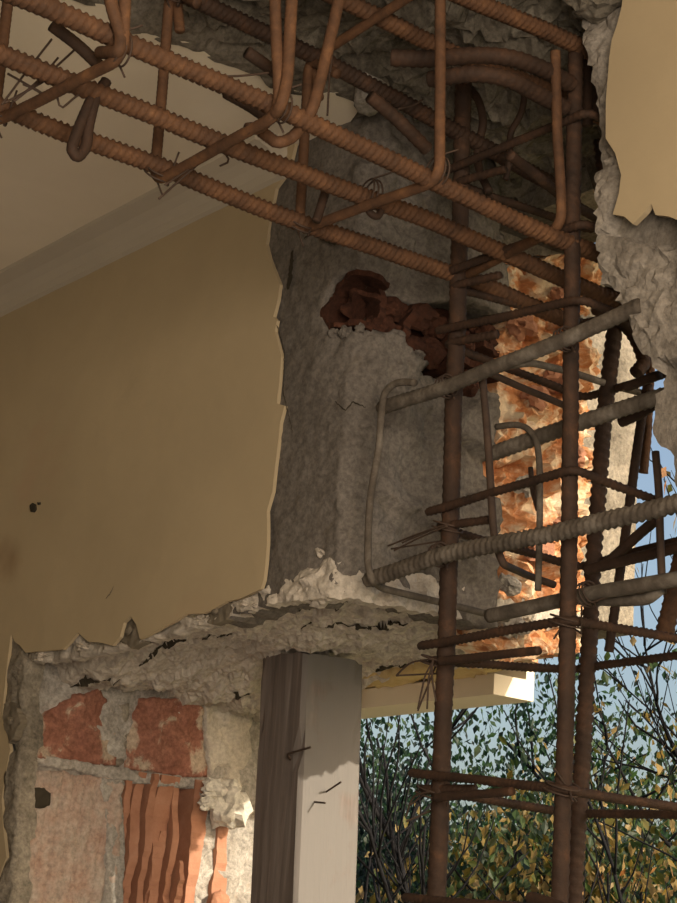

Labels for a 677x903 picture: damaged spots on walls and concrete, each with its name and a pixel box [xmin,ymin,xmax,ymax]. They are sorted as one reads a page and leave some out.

spalling [130,0,273,88]
spalling [204,0,677,633]
flaking render [0,557,439,903]
spalling [604,631,617,653]